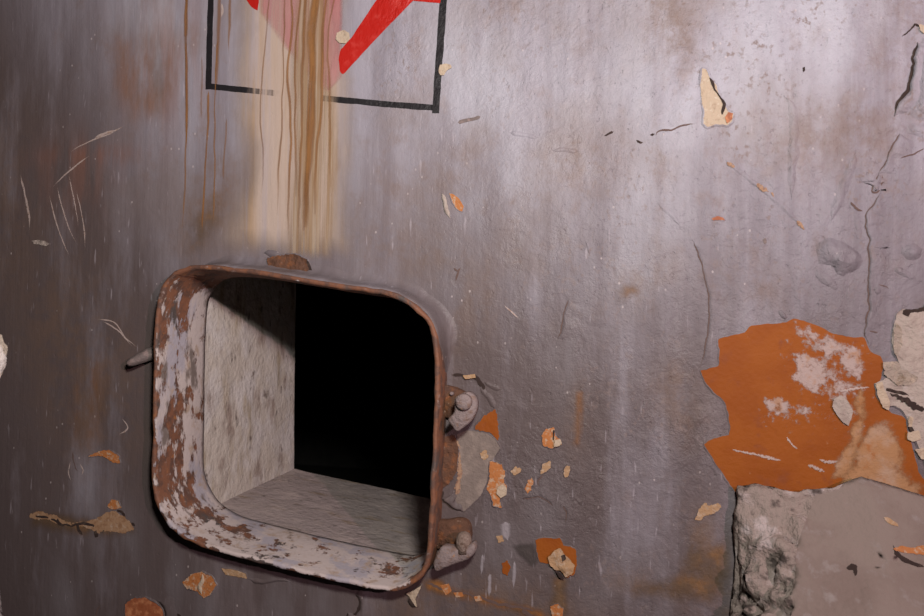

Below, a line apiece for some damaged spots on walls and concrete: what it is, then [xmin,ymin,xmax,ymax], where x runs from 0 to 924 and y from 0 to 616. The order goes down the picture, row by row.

corrosion [202,0,230,232]
corrosion [264,0,333,271]
spalling [698,67,735,130]
crack [851,23,924,347]
spalling [0,335,8,377]
peeling [699,306,924,499]
corrosion [442,434,460,488]
flaking render [454,408,562,512]
peeling [501,559,512,576]
peeling [535,537,578,579]
peeling [124,596,165,616]